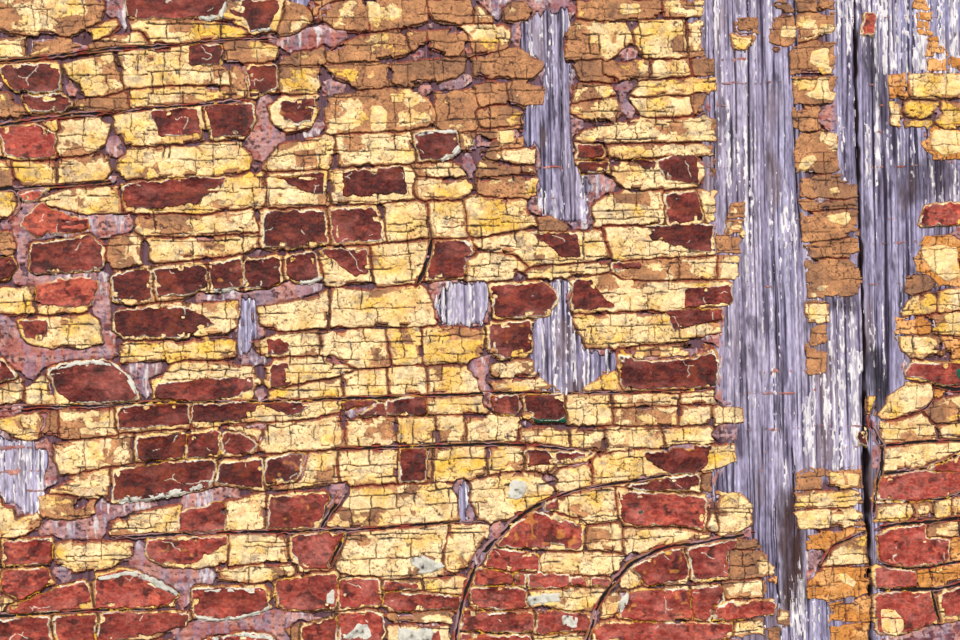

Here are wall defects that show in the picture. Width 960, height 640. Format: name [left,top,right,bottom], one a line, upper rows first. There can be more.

crack [0,37,275,64]
crack [0,98,249,127]
crack [0,179,114,224]
crack [415,240,433,286]
peeling [575,0,960,640]
crack [0,387,715,412]
crack [337,442,594,452]
crack [584,255,804,640]
crack [819,402,960,567]
crack [109,473,681,640]
crack [0,607,152,619]
crack [876,560,960,622]